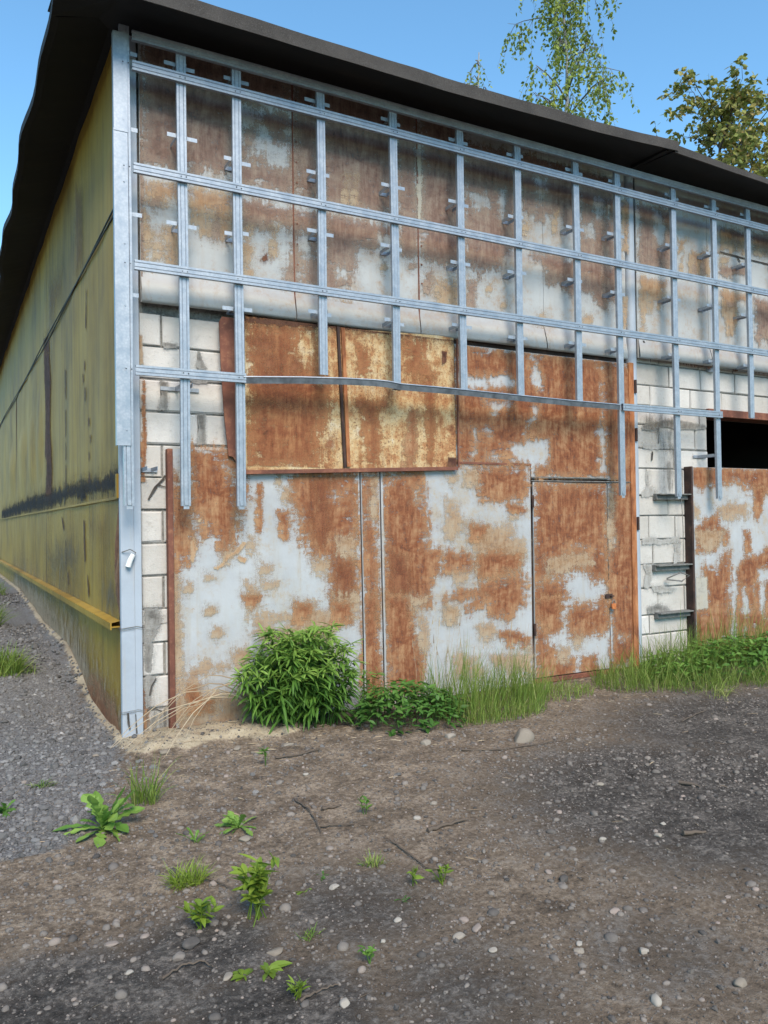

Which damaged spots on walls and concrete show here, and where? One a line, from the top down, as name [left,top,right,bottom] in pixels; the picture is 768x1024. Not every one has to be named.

corrosion [139,44,768,348]
corrosion [173,314,634,728]
corrosion [693,467,768,651]